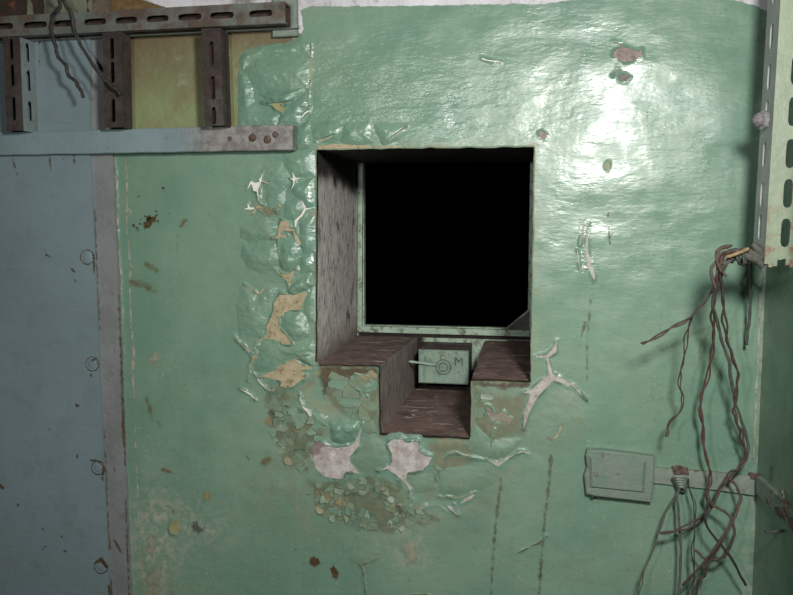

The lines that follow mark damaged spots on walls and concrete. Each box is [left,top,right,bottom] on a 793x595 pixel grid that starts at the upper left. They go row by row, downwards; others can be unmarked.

peeling [608,38,646,85]
corrosion [132,211,159,229]
peeling [573,216,599,284]
peeling [229,166,438,532]
peeling [474,336,592,432]
corrosion [94,558,112,595]